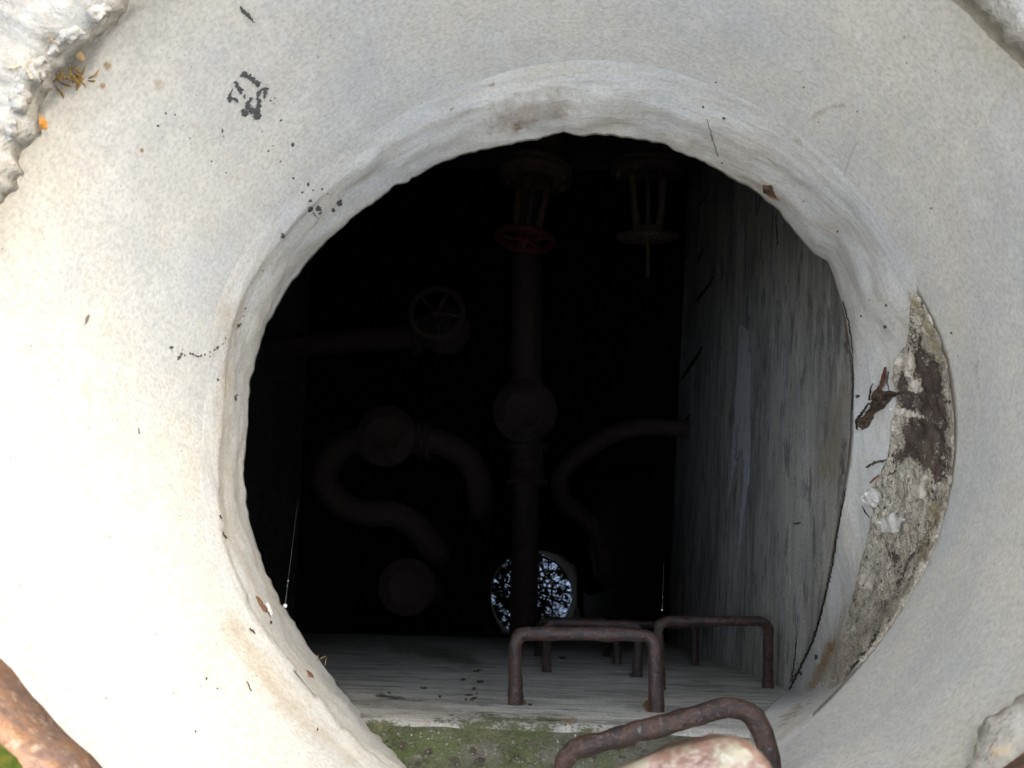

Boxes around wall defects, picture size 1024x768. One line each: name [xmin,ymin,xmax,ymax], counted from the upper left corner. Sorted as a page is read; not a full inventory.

crack [789,488,870,690]
crack [866,459,897,476]
spalling [828,292,955,689]